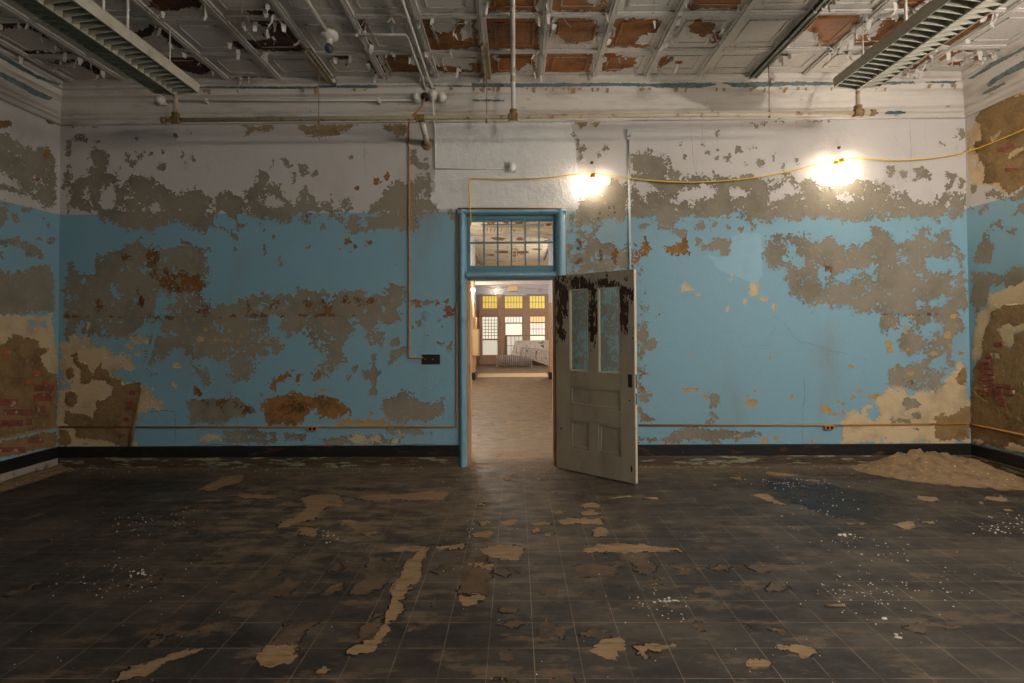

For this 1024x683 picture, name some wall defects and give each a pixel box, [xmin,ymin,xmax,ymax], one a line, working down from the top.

peeling [314,0,750,102]
peeling [0,120,456,458]
peeling [555,85,1024,456]
peeling [344,520,492,657]